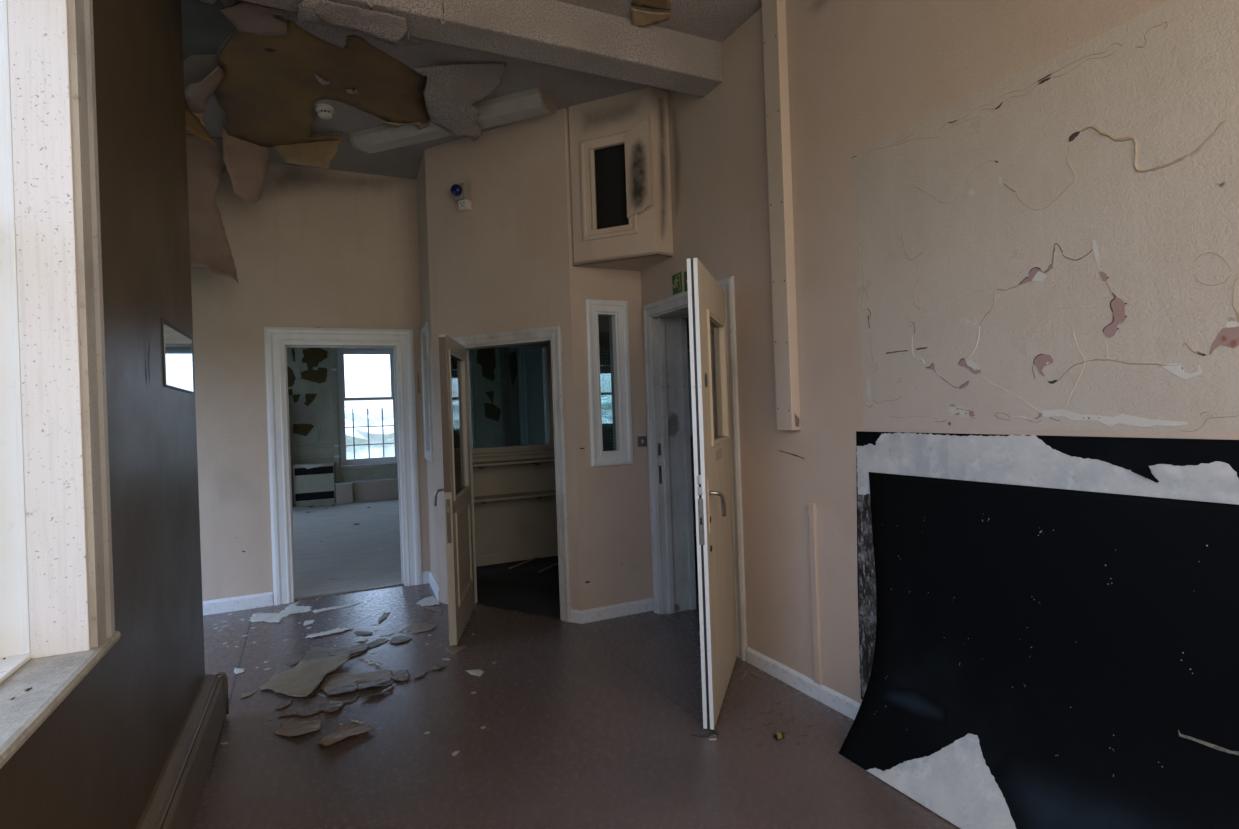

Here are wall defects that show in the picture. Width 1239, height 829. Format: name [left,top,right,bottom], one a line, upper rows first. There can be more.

damp [575,91,683,248]
peeling [911,326,1042,419]
peeling [1032,240,1178,384]
peeling [1197,277,1239,356]